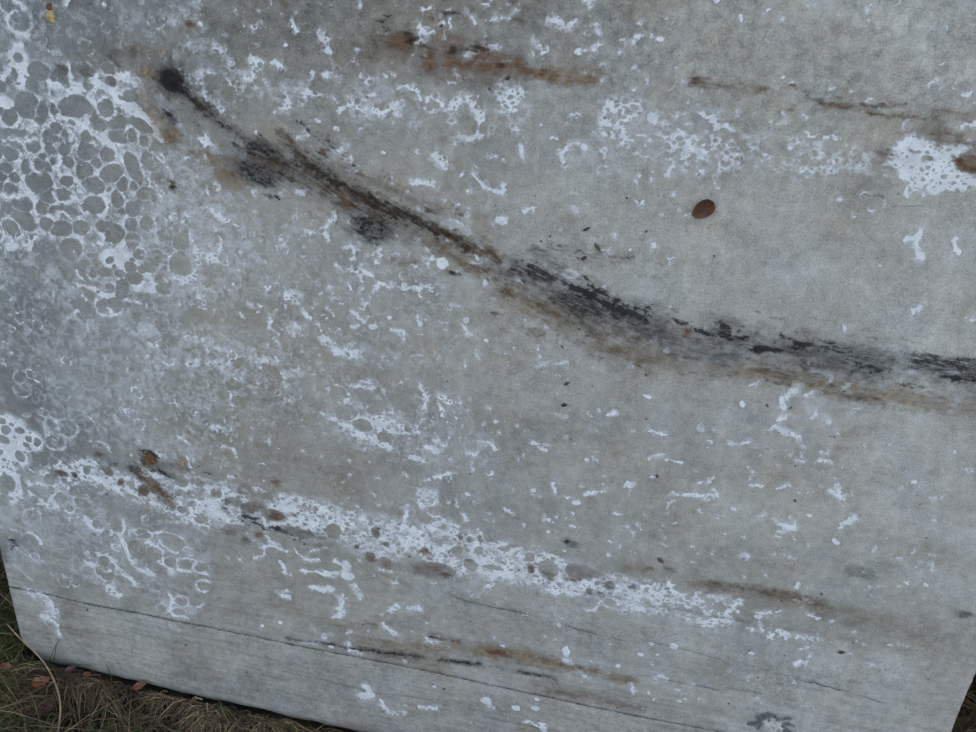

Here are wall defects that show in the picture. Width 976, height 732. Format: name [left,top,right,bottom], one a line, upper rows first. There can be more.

rust [377,15,599,84]
water stain [152,64,965,410]
water stain [904,353,976,384]
rust [128,448,174,505]
water stain [221,500,310,545]